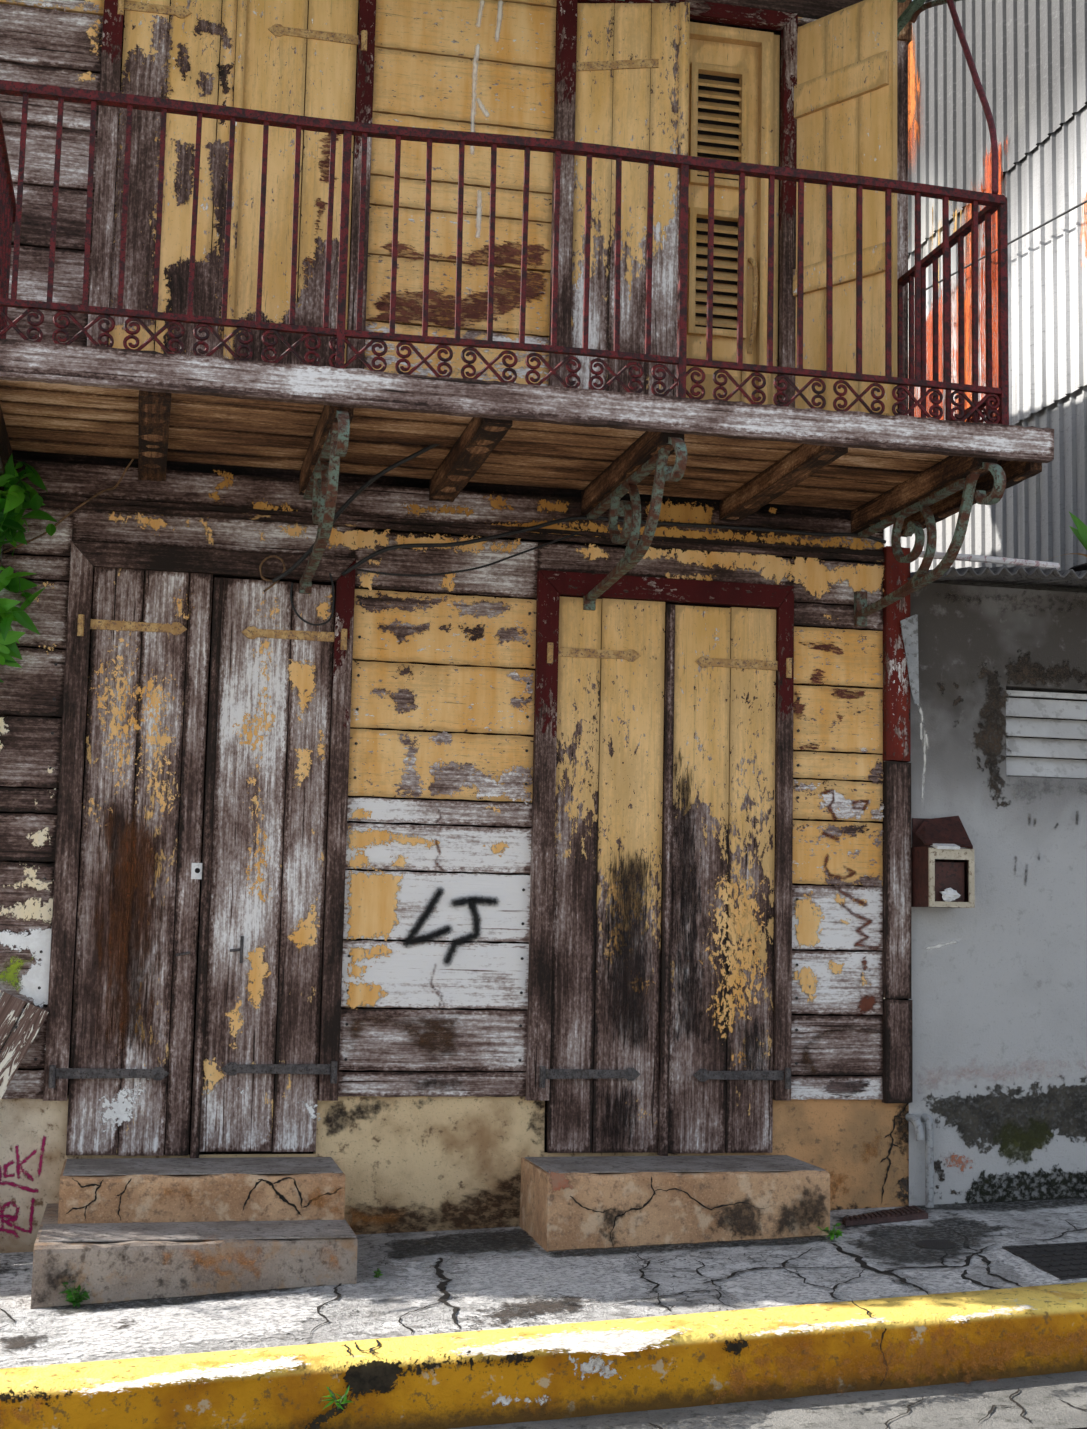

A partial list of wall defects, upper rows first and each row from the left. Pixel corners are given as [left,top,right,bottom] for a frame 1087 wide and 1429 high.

rust [908,41,919,149]
peeling [108,15,347,367]
rust [908,139,1008,423]
peeling [638,499,884,622]
water stain [600,851,655,1049]
water stain [671,750,715,1042]
crack [66,1178,131,1220]
crack [243,1177,341,1215]
water stain [347,1173,521,1234]
peeling [0,1355,311,1409]
peeling [305,1294,691,1429]
crack [570,1177,1087,1429]